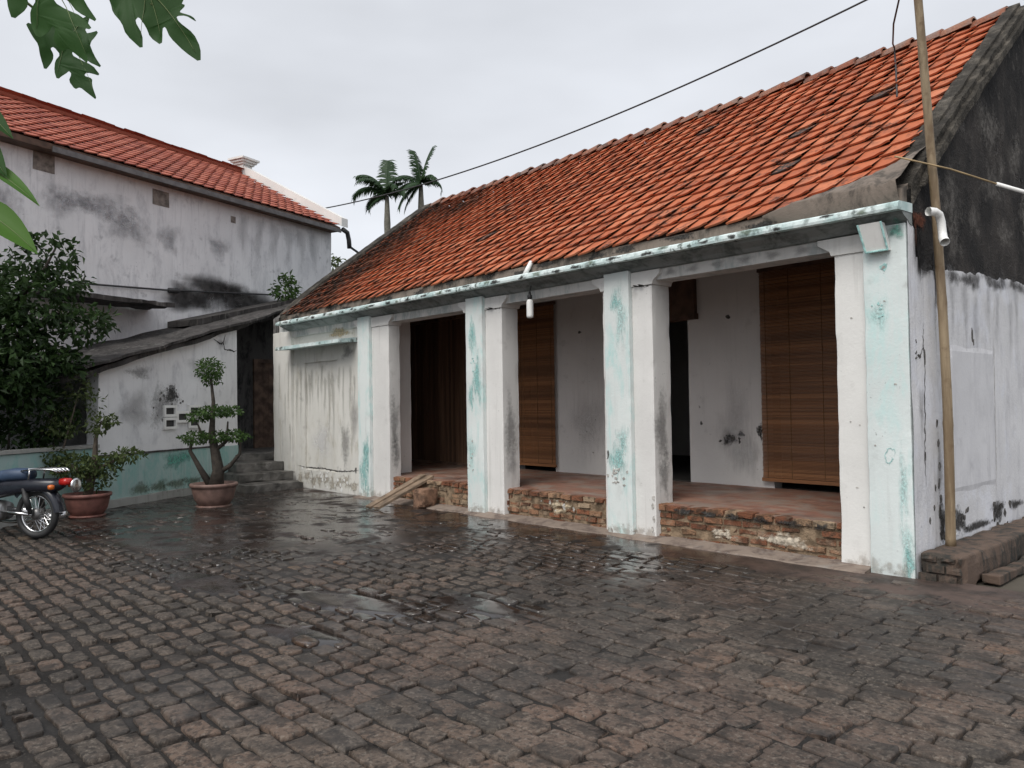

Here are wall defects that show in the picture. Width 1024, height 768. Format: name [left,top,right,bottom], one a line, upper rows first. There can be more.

water stain [914,226,937,303]
water stain [951,272,1024,291]
peeling [470,327,480,407]
mould [153,385,184,422]
crack [298,465,357,480]
peeling [607,451,628,486]